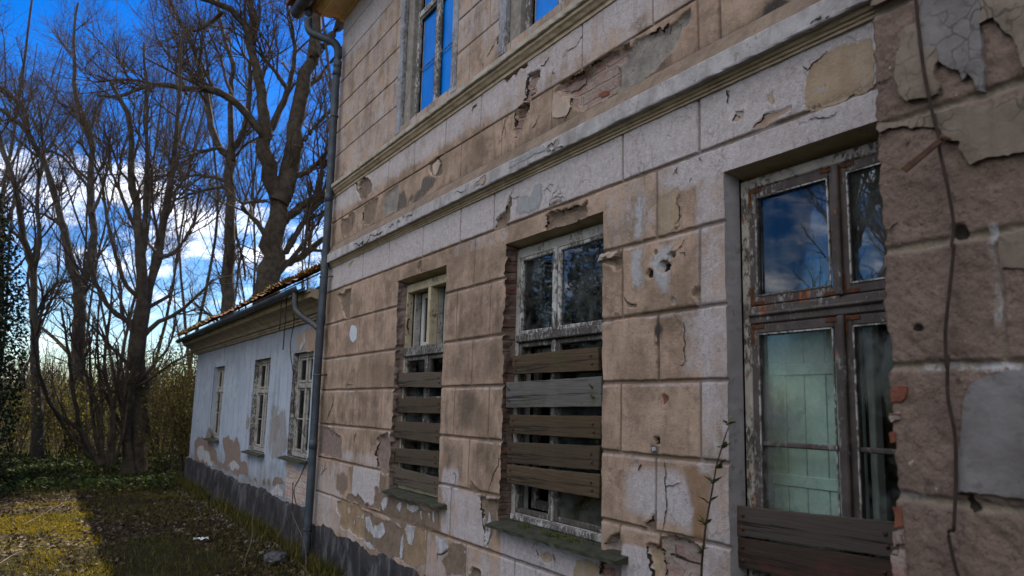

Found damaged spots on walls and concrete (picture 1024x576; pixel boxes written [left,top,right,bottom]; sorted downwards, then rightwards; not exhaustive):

flaking render [504,65,540,138]
flaking render [551,46,632,120]
peeling [803,38,876,112]
peeling [876,0,1024,166]
flaking render [430,155,443,176]
flaking render [341,178,404,246]
flaking render [545,196,588,230]
flaking render [194,414,307,505]
peeling [336,433,481,576]
flaking render [469,482,500,549]
crack [638,462,679,530]
peeling [957,370,1024,513]